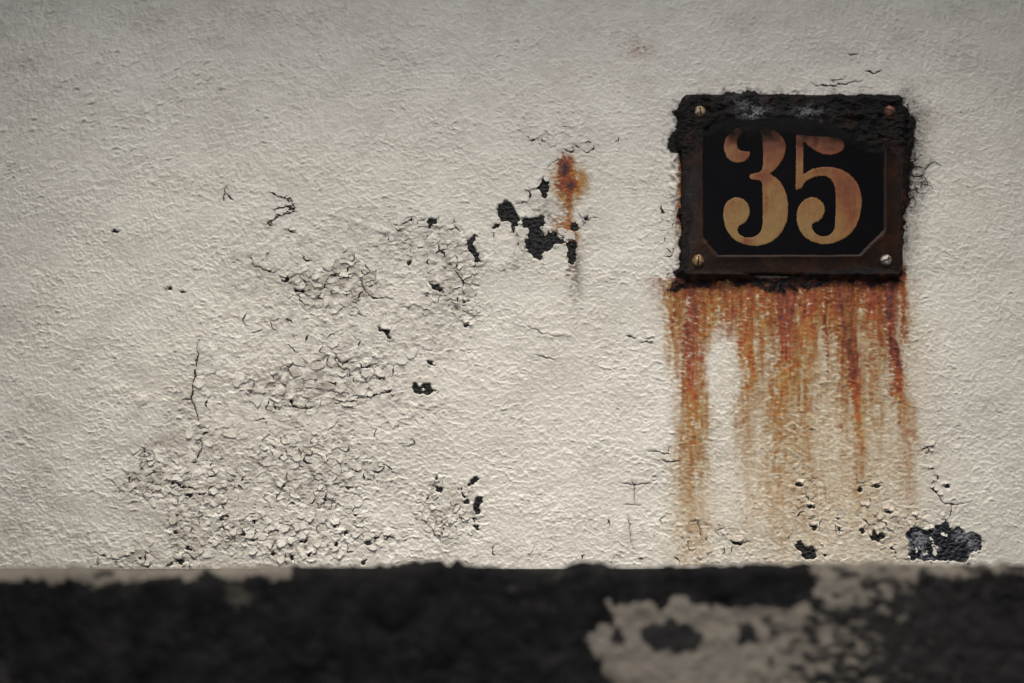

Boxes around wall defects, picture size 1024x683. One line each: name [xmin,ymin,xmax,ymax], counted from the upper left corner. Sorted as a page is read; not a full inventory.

crack [267,188,296,233]
peeling [527,175,549,199]
peeling [492,200,591,267]
corrosion [550,155,587,242]
crack [253,265,316,298]
crack [334,254,390,316]
crack [186,340,210,464]
crack [251,356,396,431]
corrosion [659,266,912,476]
crack [111,444,160,494]
crack [97,549,135,568]
peeling [585,475,1024,683]